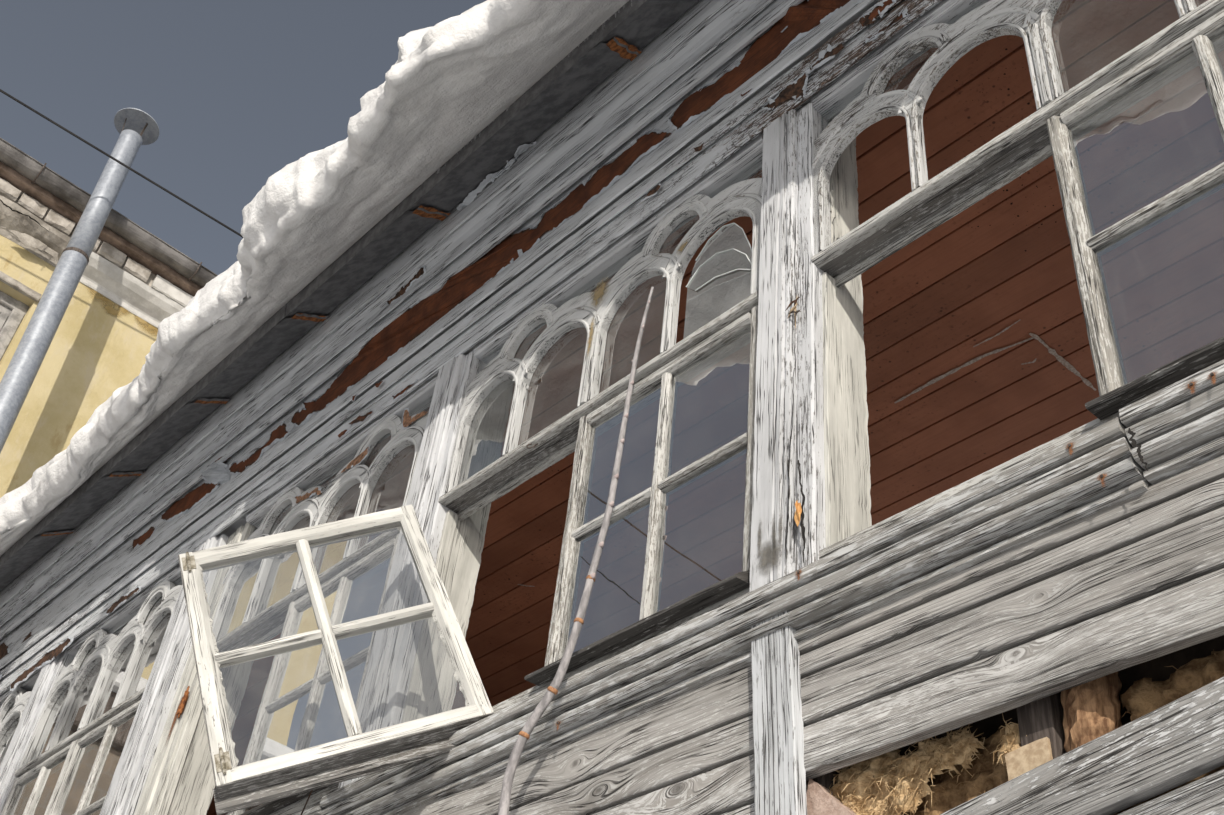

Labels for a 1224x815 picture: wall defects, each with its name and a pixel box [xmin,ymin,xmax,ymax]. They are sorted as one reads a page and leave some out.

corrosion [606,37,641,61]
peeling [132,0,908,550]
crack [785,368,806,563]
crack [1128,428,1148,471]